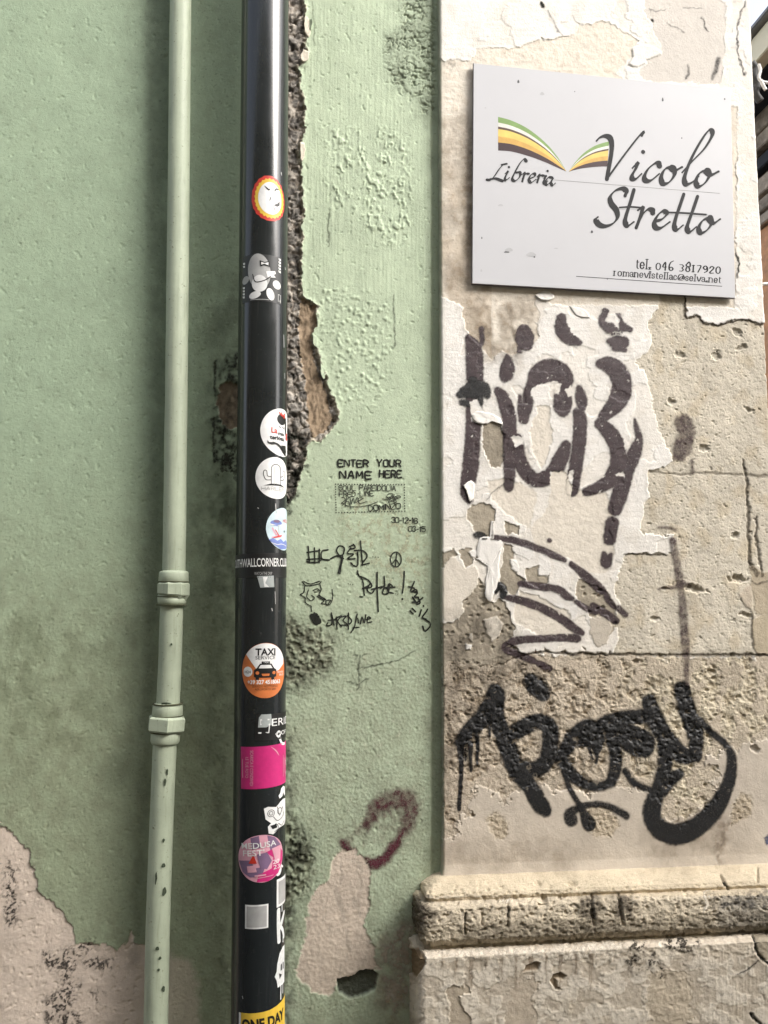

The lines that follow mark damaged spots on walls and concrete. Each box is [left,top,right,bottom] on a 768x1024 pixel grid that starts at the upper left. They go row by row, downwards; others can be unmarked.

spalling [287,0,340,503]
flaking render [381,0,768,841]
flaking render [0,820,206,1024]
peeling [285,811,383,998]
spalling [410,947,427,977]
spalling [752,933,768,960]
spalling [445,984,472,1024]
spalling [504,975,541,1024]
flaking render [643,968,695,1024]